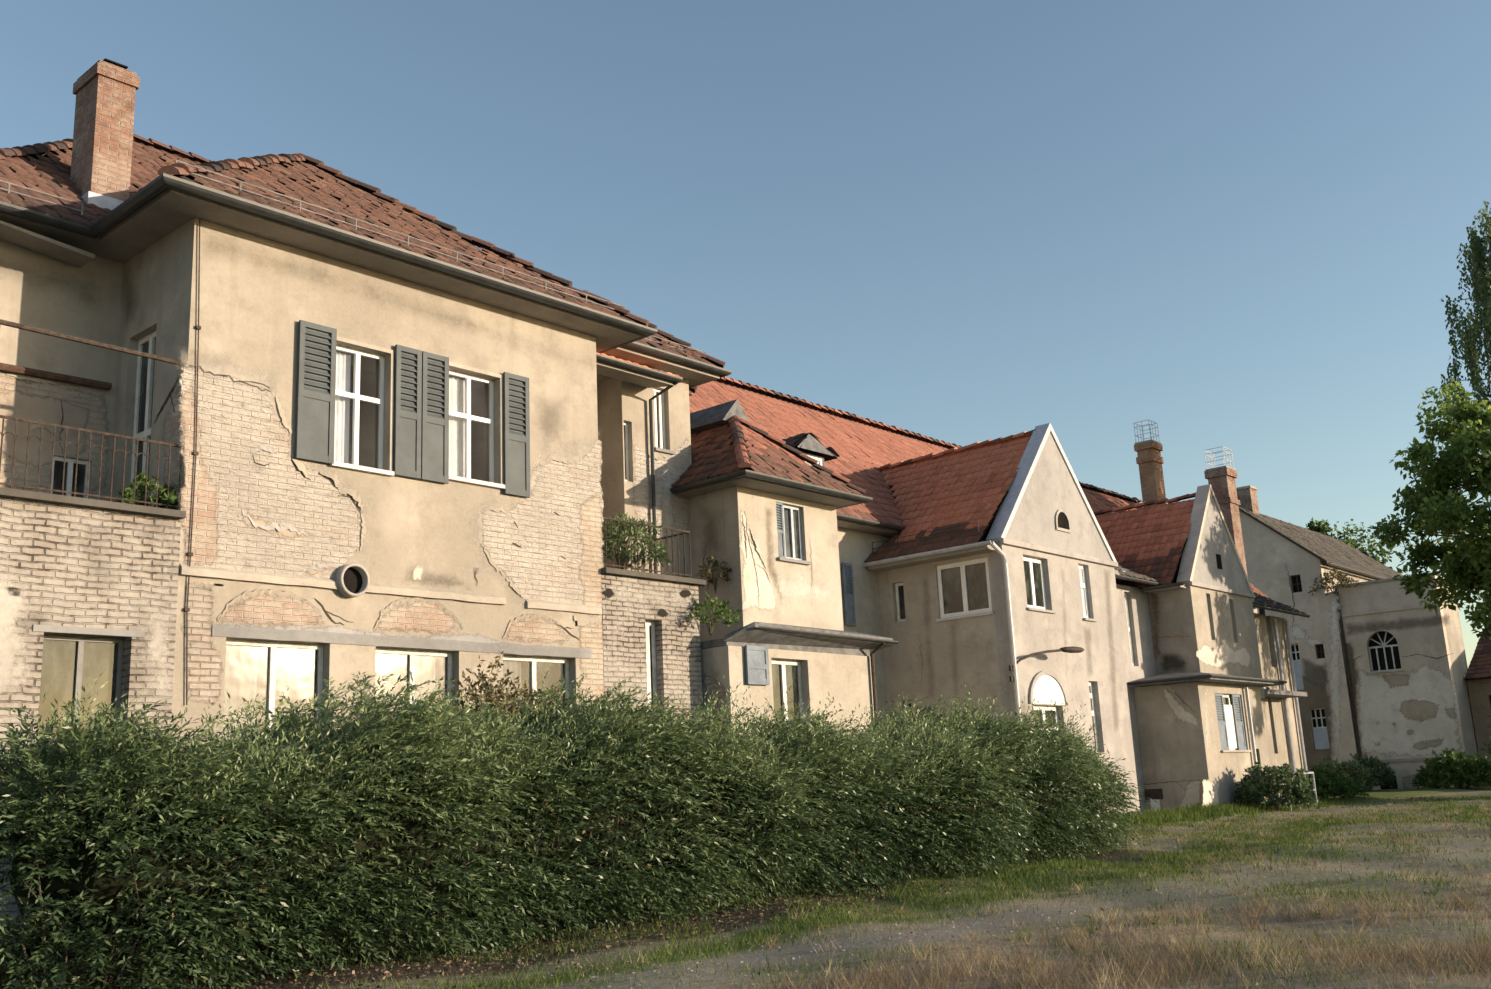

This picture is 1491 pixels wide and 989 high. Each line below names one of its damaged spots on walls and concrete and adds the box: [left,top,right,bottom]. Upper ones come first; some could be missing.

peeling [0,372,109,490]
peeling [163,359,614,709]
crack [744,511,770,600]
peeling [1196,642,1251,668]
peeling [1289,594,1461,789]